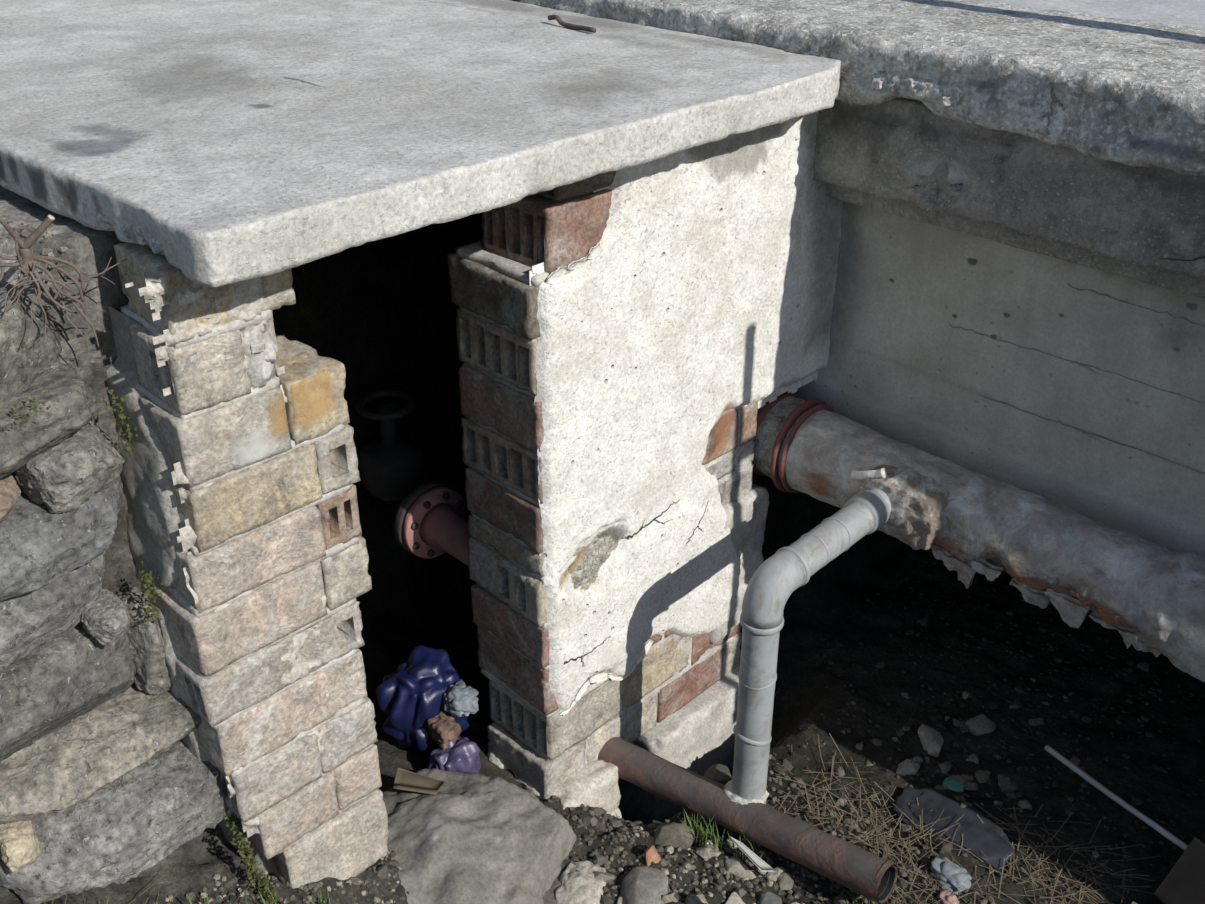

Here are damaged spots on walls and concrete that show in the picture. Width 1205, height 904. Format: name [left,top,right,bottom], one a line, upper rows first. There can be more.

water stain [62,140,129,154]
peeling [544,243,603,285]
crack [1162,254,1205,262]
crack [622,499,708,544]
spalling [567,531,616,589]
crack [564,636,610,667]
peeling [559,639,654,716]